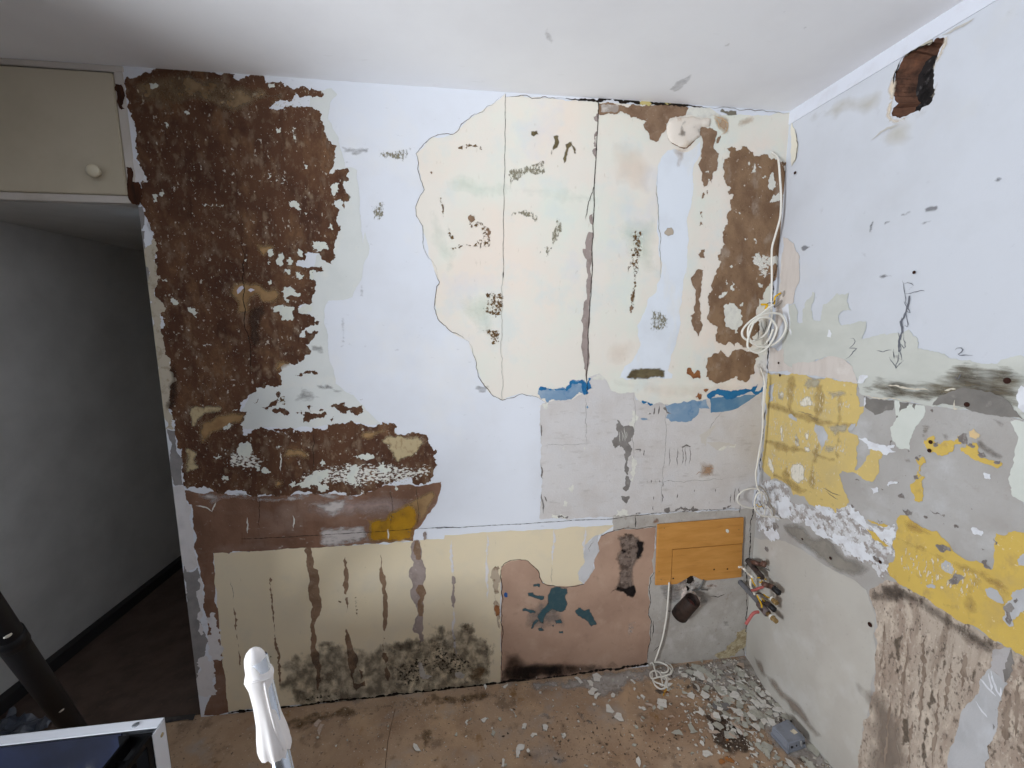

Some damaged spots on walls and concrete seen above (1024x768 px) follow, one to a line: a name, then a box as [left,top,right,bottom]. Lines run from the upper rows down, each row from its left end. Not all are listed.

spalling [887,37,946,122]
flaking render [124,68,441,716]
peeling [415,94,1024,768]
damp [613,534,643,597]
damp [269,532,491,705]
damp [505,657,575,680]
damp [758,663,807,722]
damp [873,624,975,768]
damp [993,678,1020,746]